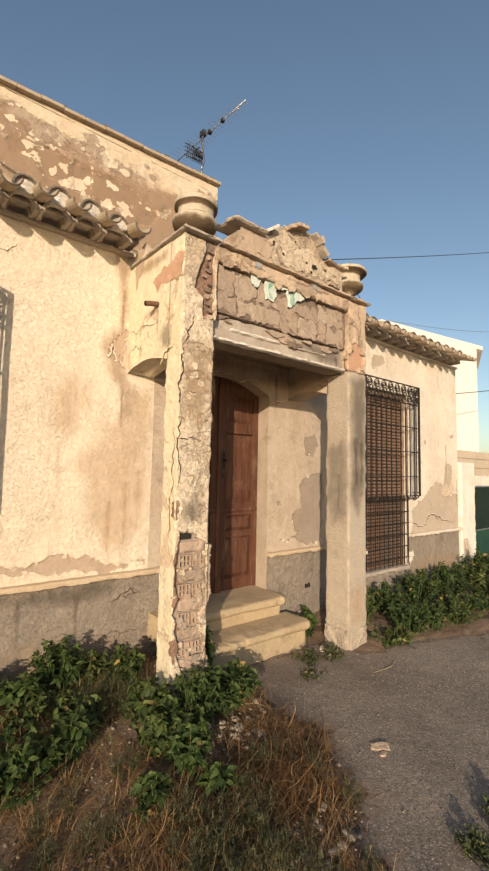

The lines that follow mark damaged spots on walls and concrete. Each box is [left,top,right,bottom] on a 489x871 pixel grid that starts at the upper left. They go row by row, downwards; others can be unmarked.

peeling [0,100,171,232]
spalling [153,250,185,293]
spalling [240,226,337,284]
flaking render [195,244,385,374]
flaking render [181,350,212,399]
flaking render [199,477,209,506]
spalling [411,464,458,533]
spalling [0,554,145,577]
crack [105,583,144,603]